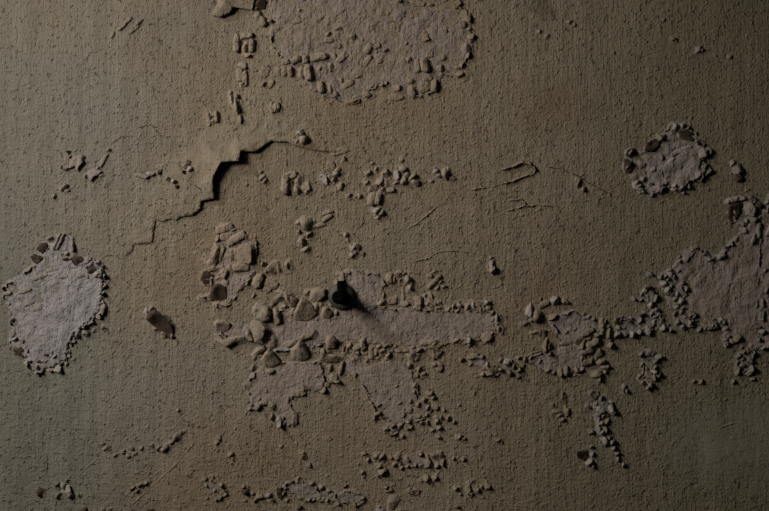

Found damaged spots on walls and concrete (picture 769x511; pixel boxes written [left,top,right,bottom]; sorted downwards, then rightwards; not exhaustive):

peeling [211,0,477,106]
peeling [60,146,112,188]
peeling [621,121,712,199]
peeling [1,233,110,376]
peeling [458,159,769,471]
peeling [241,344,468,511]
peeling [452,477,492,511]